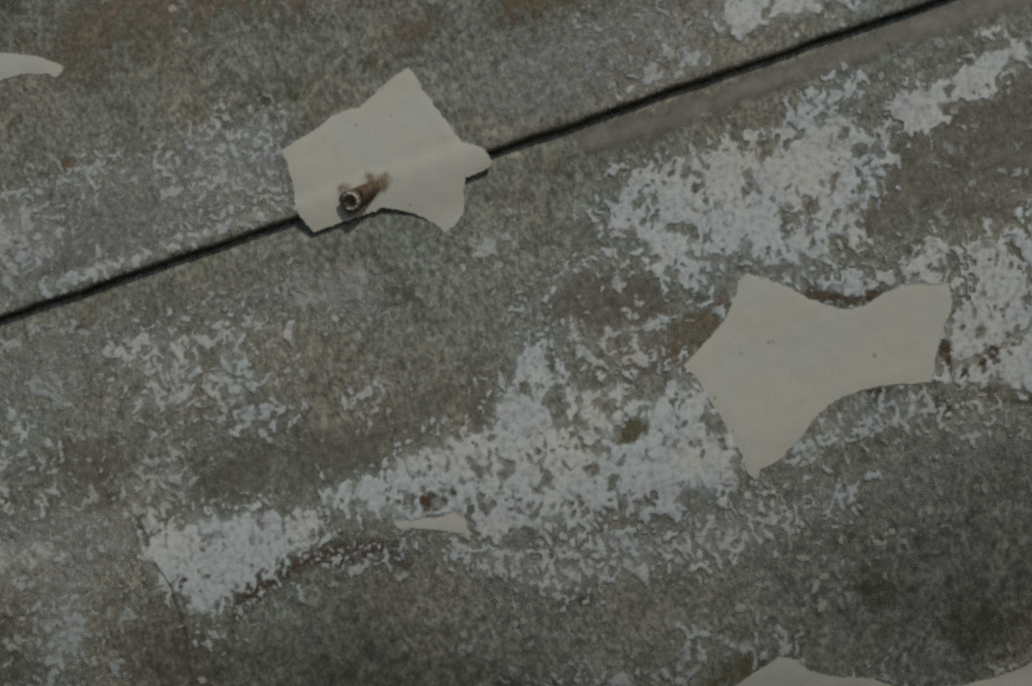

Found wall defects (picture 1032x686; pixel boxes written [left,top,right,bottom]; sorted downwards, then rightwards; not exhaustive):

peeling [703,0,869,41]
peeling [0,53,63,81]
peeling [566,0,713,107]
peeling [0,67,492,312]
peeling [460,208,528,272]
peeling [536,252,599,308]
peeling [621,295,648,320]
peeling [341,380,391,434]
peeling [0,291,311,686]
peeling [811,573,829,612]
peeling [546,603,907,686]
peeling [965,644,1032,686]